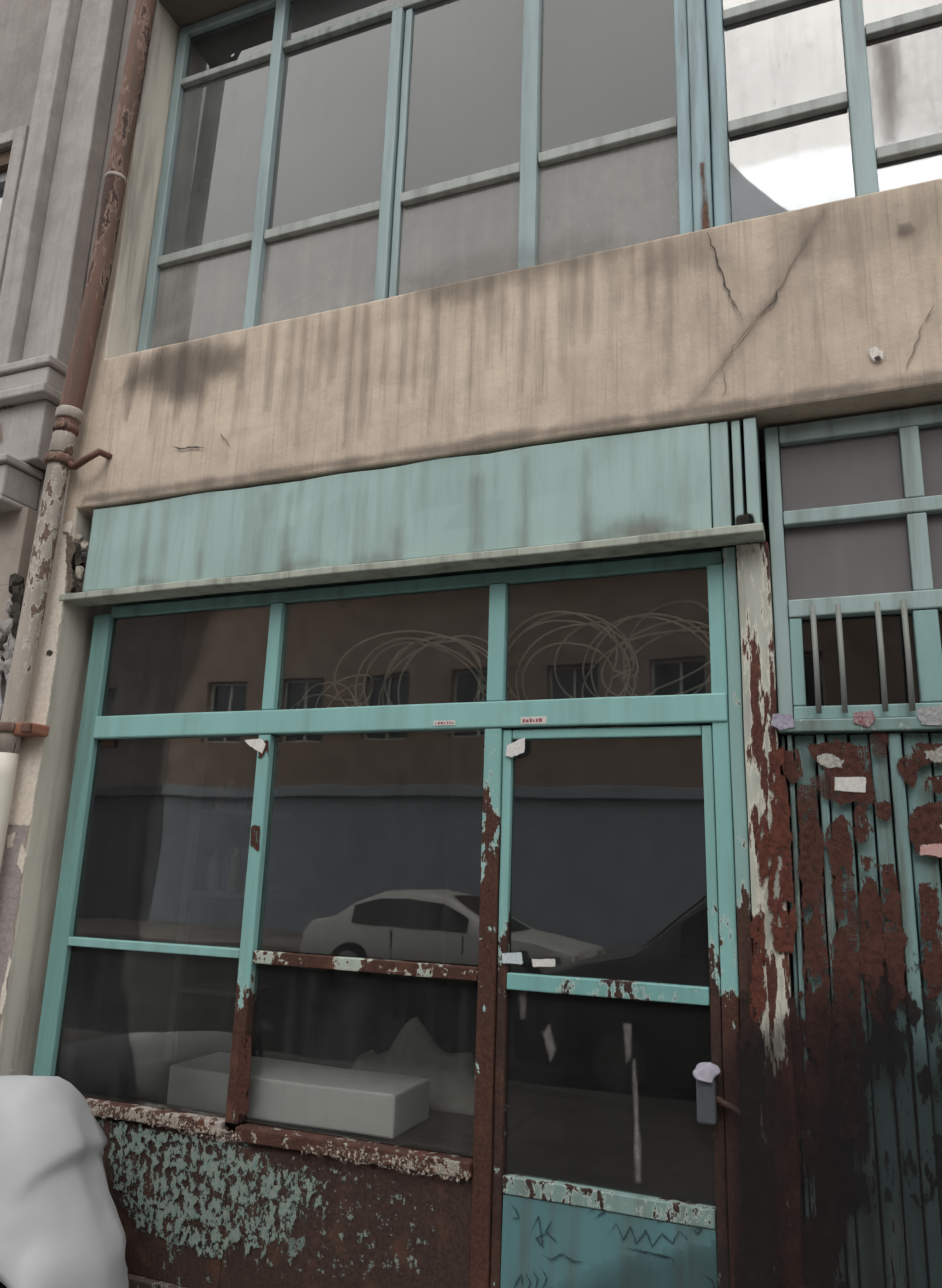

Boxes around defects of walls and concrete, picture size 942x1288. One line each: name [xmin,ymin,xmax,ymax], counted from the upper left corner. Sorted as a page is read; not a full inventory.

leakage [141,351,231,391]
crack [690,217,819,407]
crack [906,306,934,369]
peeling [0,521,89,1018]